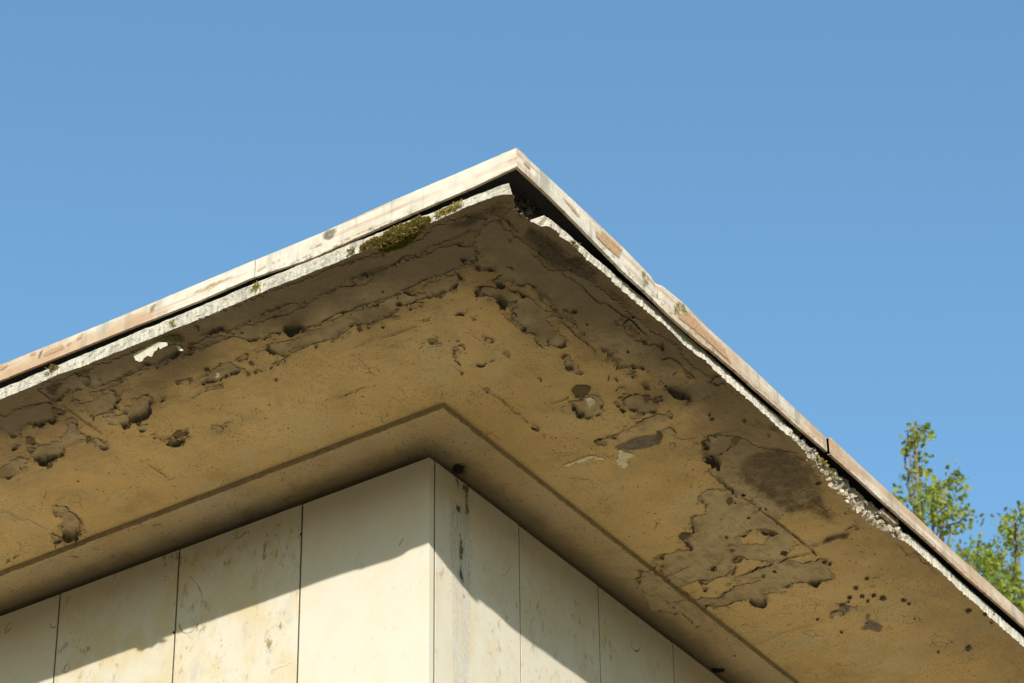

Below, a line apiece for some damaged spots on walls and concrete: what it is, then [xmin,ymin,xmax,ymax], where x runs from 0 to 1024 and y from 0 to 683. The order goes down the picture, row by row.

peeling [132,216,730,446]
crack [538,295,595,351]
peeling [0,373,190,481]
peeling [49,505,86,549]
damp [452,465,469,645]
peeling [636,433,902,628]
damp [740,452,832,519]